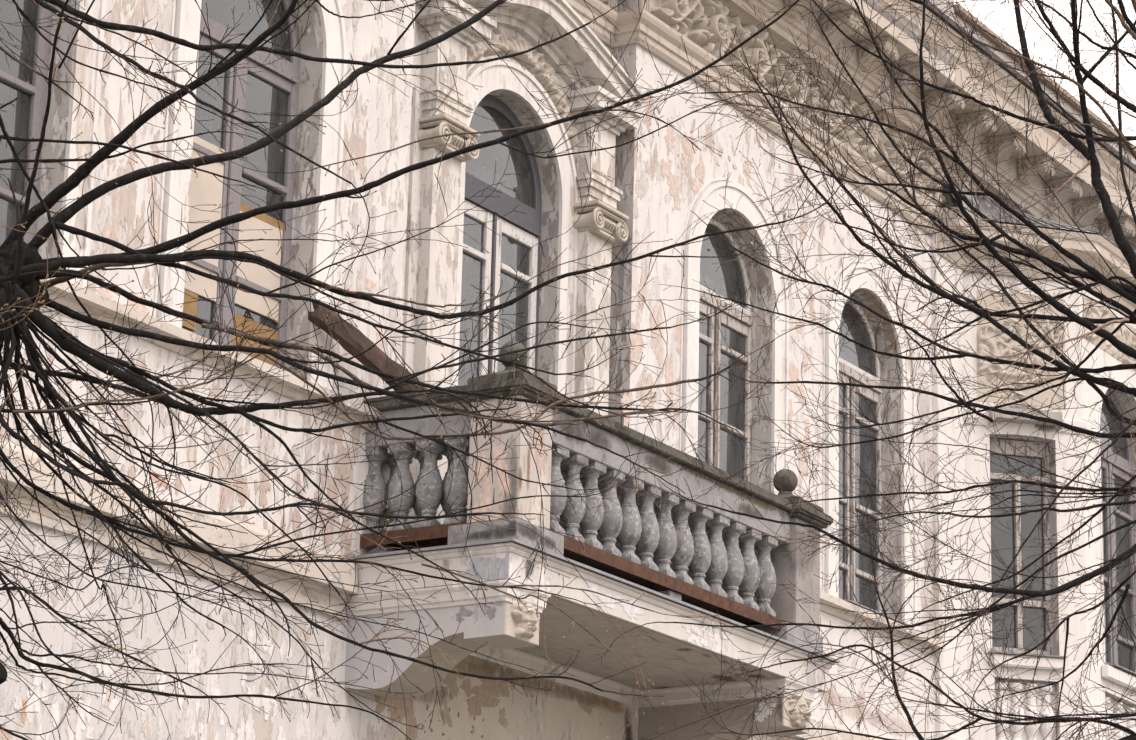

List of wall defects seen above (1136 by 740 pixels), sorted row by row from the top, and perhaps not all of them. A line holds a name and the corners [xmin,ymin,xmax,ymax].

flaking render [619,96,761,219]
peeling [13,611,340,740]
flaking render [362,662,535,740]